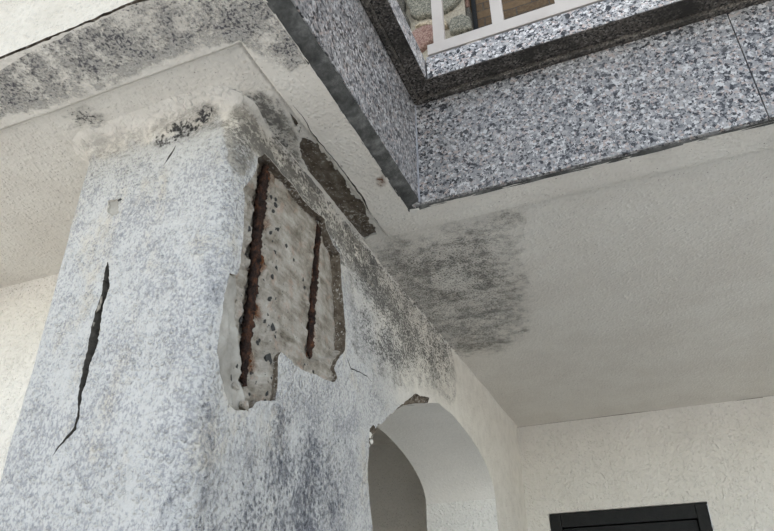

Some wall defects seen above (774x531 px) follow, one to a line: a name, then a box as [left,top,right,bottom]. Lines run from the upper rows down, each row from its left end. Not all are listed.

crack [54,262,110,454]
damp [156,105,213,148]
spalling [217,153,346,411]
damp [221,93,525,399]